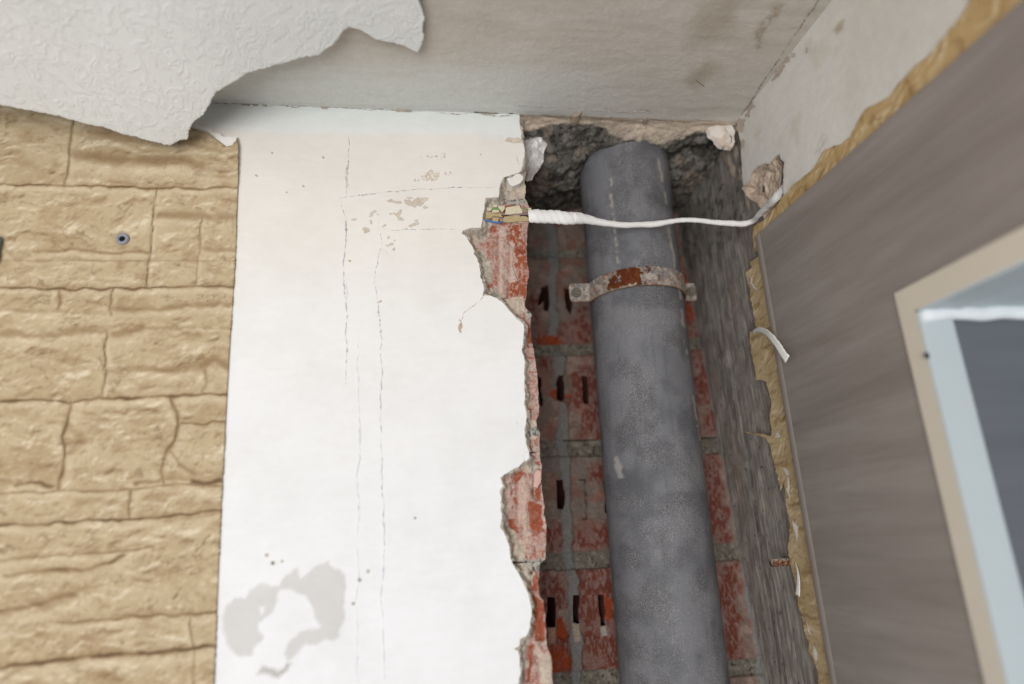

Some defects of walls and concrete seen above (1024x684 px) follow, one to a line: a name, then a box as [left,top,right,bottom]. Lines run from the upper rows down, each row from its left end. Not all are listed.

flaking render [742,156,783,219]
corrosion [607,266,657,291]
spalling [564,288,572,314]
flaking render [462,115,565,684]
spalling [581,376,589,404]
spalling [598,595,606,626]